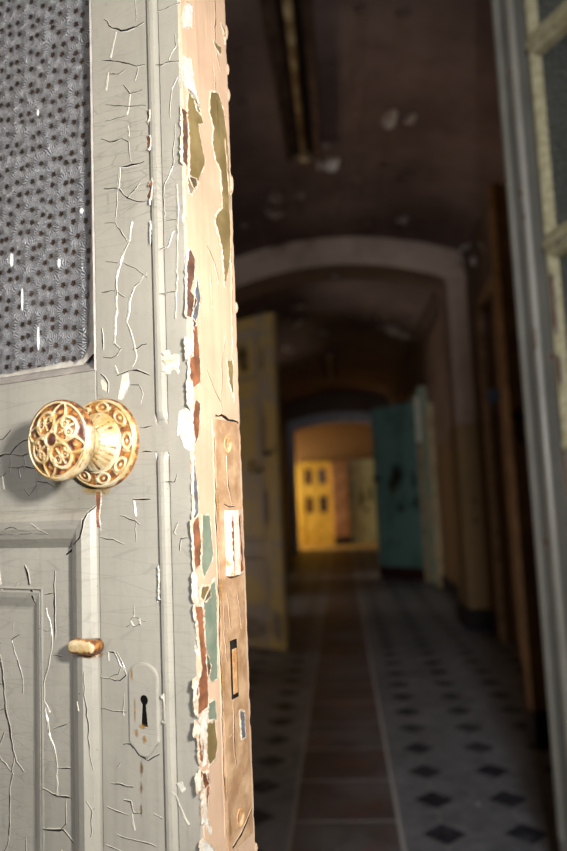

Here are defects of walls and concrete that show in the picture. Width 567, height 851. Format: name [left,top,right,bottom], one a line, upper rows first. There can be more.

peeling [181,1,193,30]
peeling [213,23,229,75]
peeling [179,55,234,288]
peeling [315,157,340,172]
crack [100,2,180,405]
peeling [226,348,248,397]
crack [0,429,55,496]
crack [173,523,188,551]
peeling [162,247,219,851]
crack [0,498,162,851]
peeling [239,709,247,741]
crack [171,791,189,825]